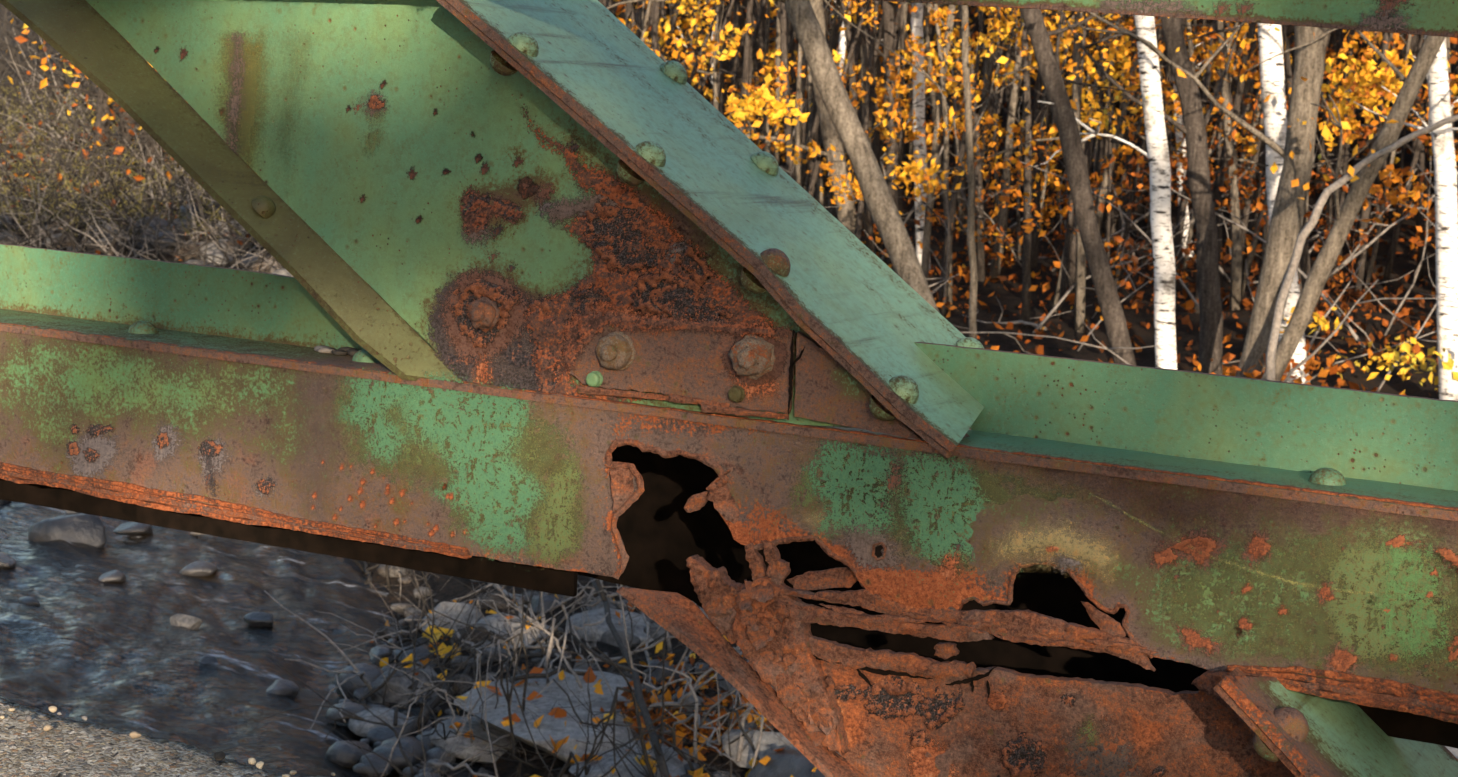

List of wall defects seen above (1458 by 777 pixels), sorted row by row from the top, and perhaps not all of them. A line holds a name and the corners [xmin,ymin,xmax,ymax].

rust [424,106,790,404]
rust [65,424,125,478]
rust [148,422,232,499]
rust [321,460,413,529]
peeling [684,491,709,513]
peeling [787,566,858,591]
rust [840,511,901,572]
peeling [785,438,1087,586]
rust [1145,528,1273,595]
rust [1378,534,1458,604]
rust [686,540,1167,777]
rust [1171,616,1255,734]